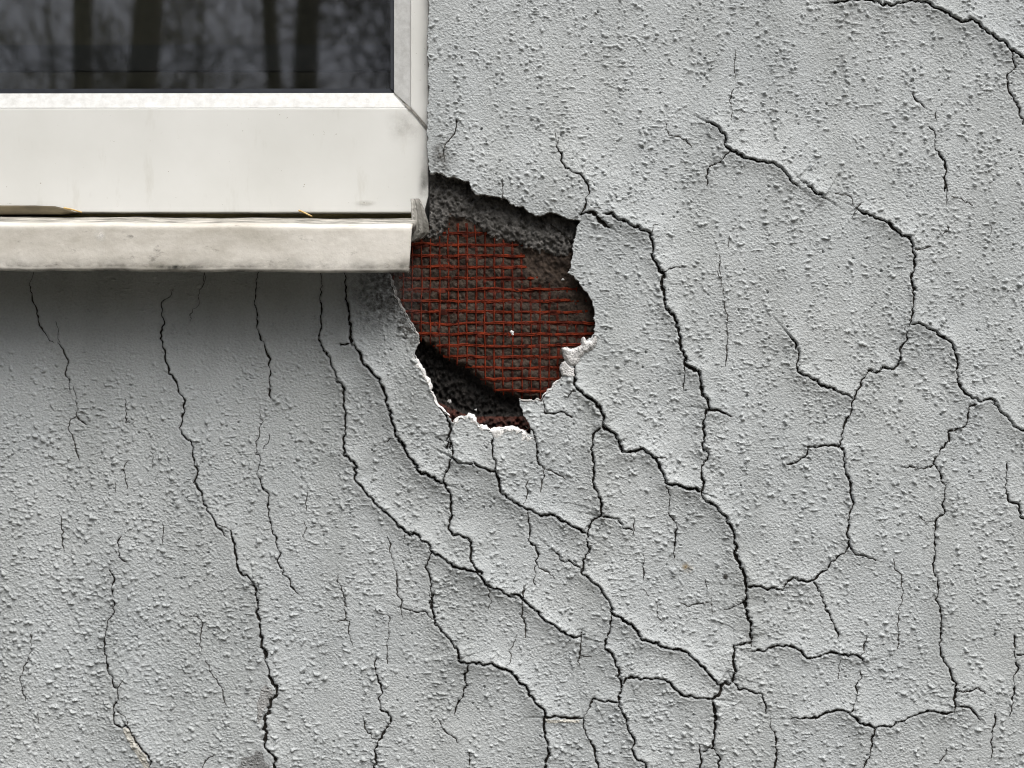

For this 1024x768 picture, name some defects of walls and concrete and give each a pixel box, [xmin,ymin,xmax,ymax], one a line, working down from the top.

crack [834,0,1024,124]
crack [19,632,39,724]
crack [29,272,87,460]
crack [103,536,152,767]
crack [160,290,278,768]
crack [254,272,308,594]
flaking render [389,173,597,441]
crack [318,51,1024,768]